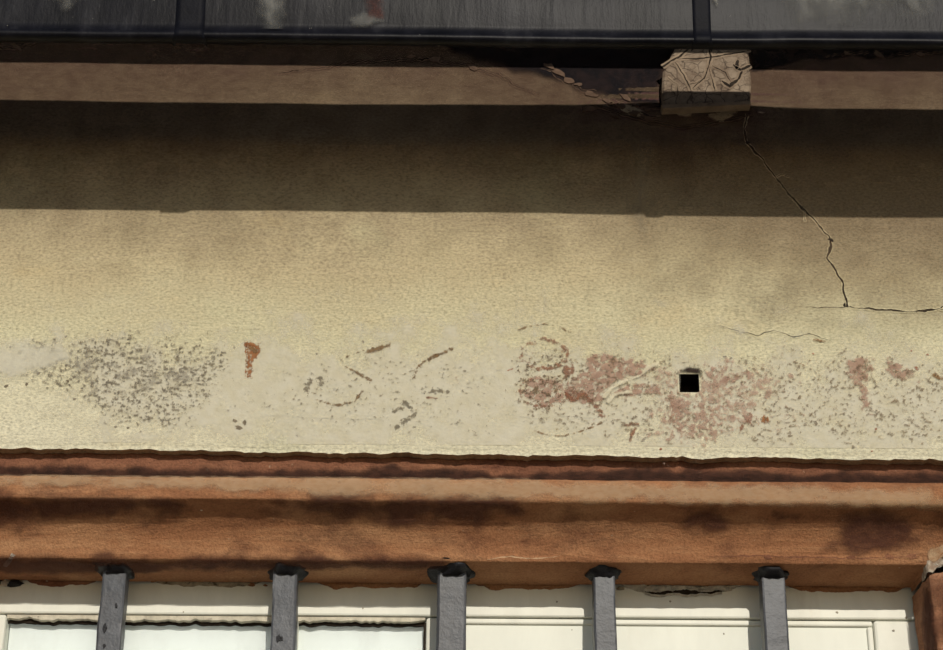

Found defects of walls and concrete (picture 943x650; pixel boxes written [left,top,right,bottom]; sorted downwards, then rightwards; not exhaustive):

water stain [0,42,671,122]
flaking render [543,63,657,122]
water stain [731,52,943,125]
crack [719,114,943,343]
peeling [264,354,484,432]
peeling [505,345,943,453]
water stain [300,492,522,525]
spalling [704,545,943,582]
water stain [842,512,912,554]